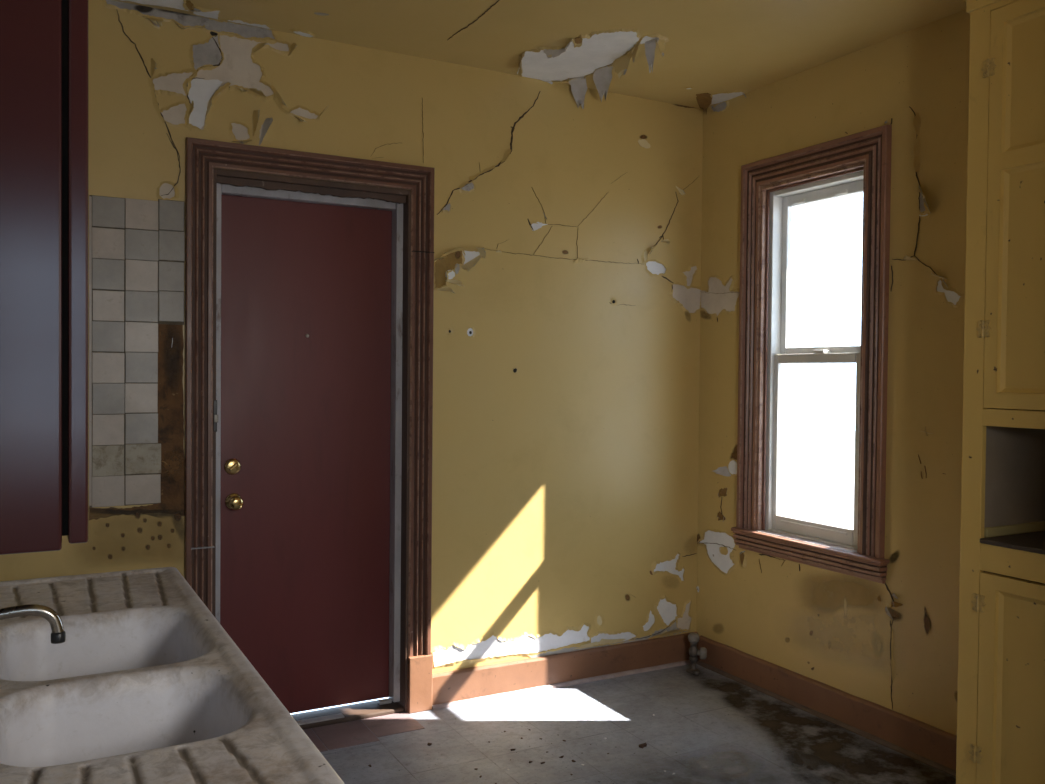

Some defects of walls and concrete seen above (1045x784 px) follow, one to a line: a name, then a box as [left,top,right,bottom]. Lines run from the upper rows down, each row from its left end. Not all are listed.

crack [117,11,181,201]
peeling [106,0,329,145]
crack [448,0,499,40]
crack [437,92,540,215]
peeling [517,28,670,109]
peeling [675,87,749,115]
peeling [434,246,486,293]
crack [487,176,699,283]
peeling [669,264,739,322]
peeling [431,527,785,669]
crack [885,583,897,710]